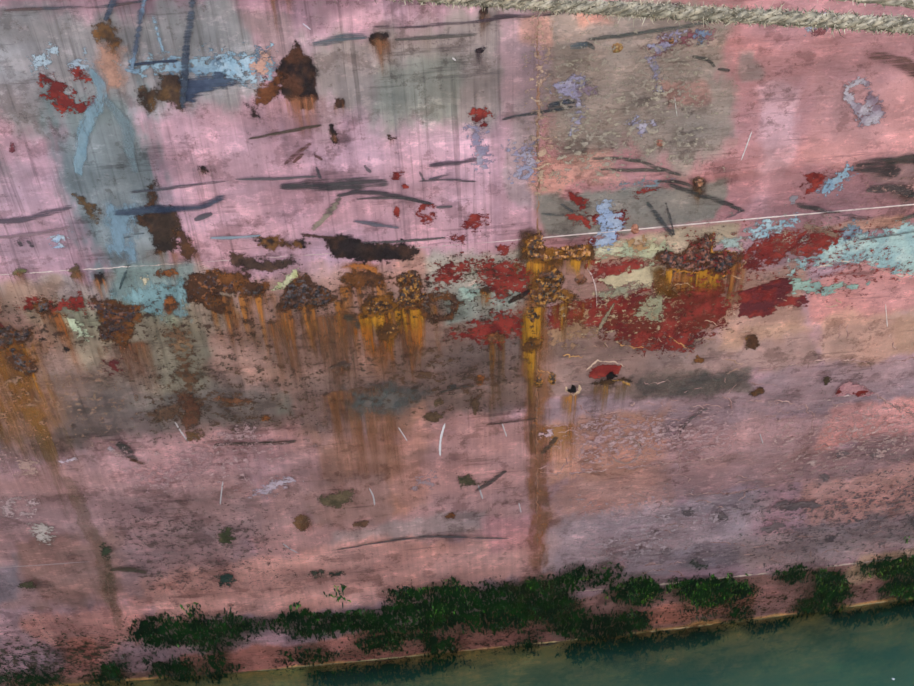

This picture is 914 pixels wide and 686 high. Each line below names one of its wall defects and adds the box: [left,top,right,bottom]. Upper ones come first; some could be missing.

corrosion [243,40,319,120]
corrosion [71,193,102,226]
corrosion [68,263,83,282]
corrosion [88,272,152,376]
corrosion [127,179,464,442]
peeling [0,20,914,519]
corrosion [654,233,745,306]
corrosion [0,325,57,464]
corrosion [508,230,596,568]
peeling [0,490,58,545]
peeling [97,495,299,605]
peeling [0,615,157,686]